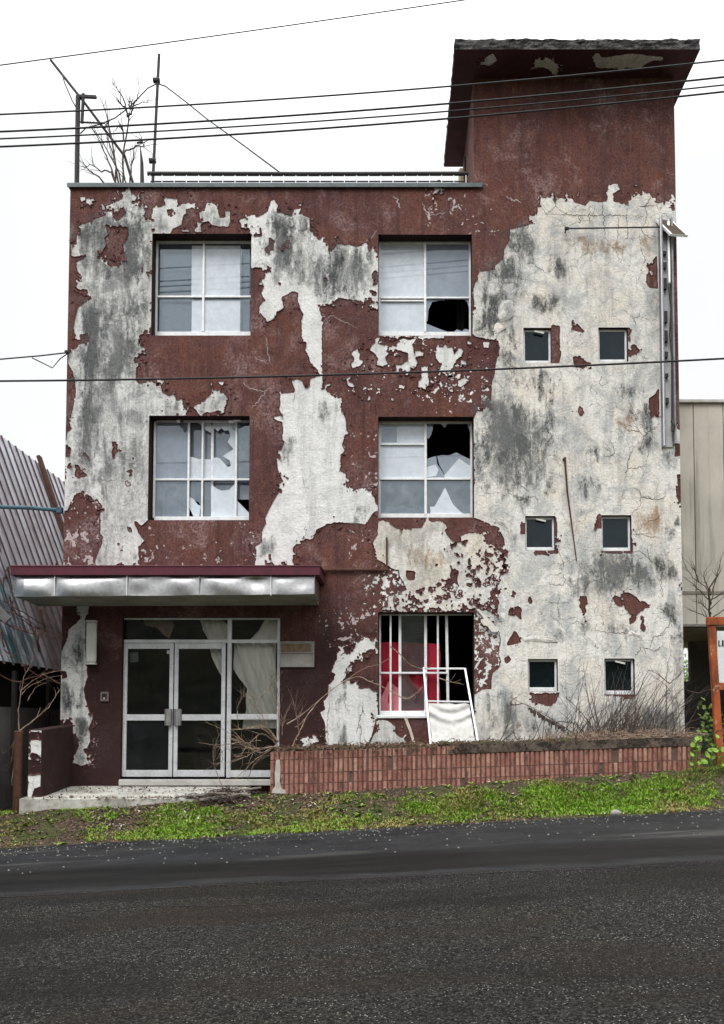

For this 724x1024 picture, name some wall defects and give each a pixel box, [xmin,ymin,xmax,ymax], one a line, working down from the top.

spalling [473,51,498,67]
spalling [527,55,565,77]
spalling [586,50,664,73]
water stain [73,209,151,282]
crack [506,196,657,262]
water stain [79,293,143,457]
water stain [94,407,149,564]
peeling [64,175,685,751]
water stain [475,369,553,502]
crack [550,425,677,672]
peeling [60,606,98,772]